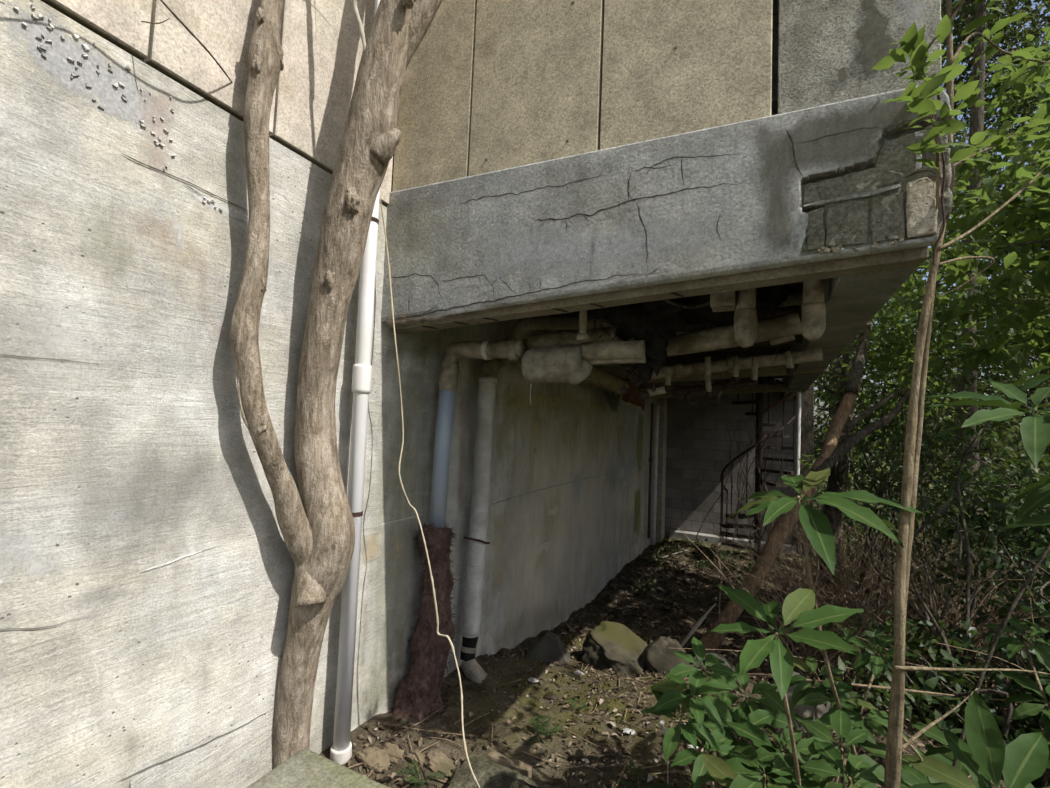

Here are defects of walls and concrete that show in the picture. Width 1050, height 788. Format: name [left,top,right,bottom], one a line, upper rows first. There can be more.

water stain [856,0,899,75]
crack [120,152,249,212]
spalling [803,131,942,253]
crack [391,153,741,320]
crack [0,354,104,365]
crack [0,613,97,630]
crack [117,707,275,788]